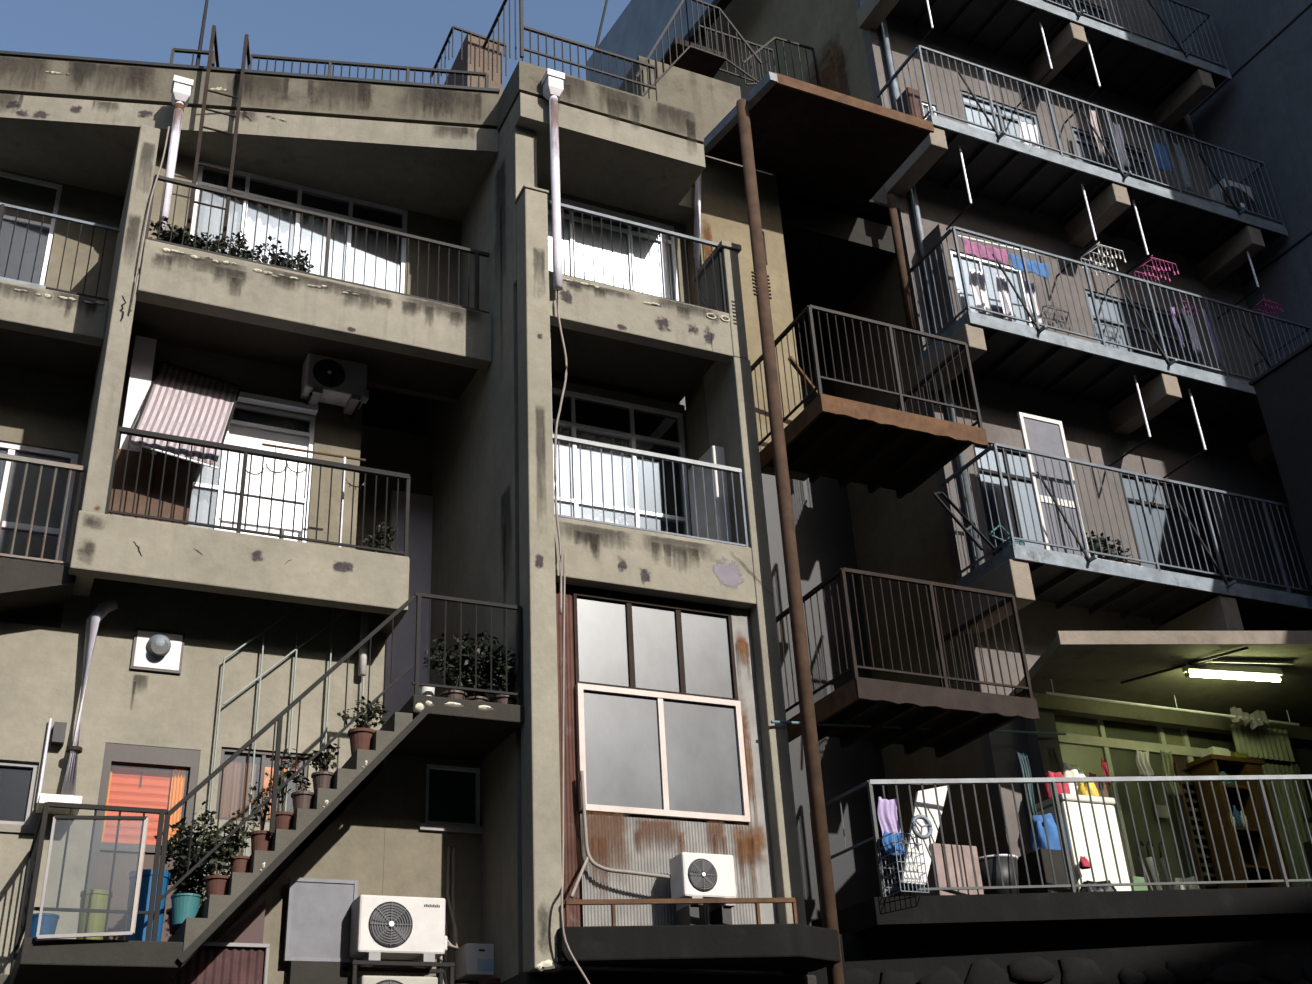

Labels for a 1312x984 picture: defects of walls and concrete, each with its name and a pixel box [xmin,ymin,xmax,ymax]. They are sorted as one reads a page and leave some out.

damp [0,94,49,118]
damp [157,252,245,286]
damp [0,283,29,294]
damp [276,272,477,319]
damp [570,525,620,548]
damp [651,536,703,562]
damp [618,557,650,581]
corrosion [586,811,685,876]